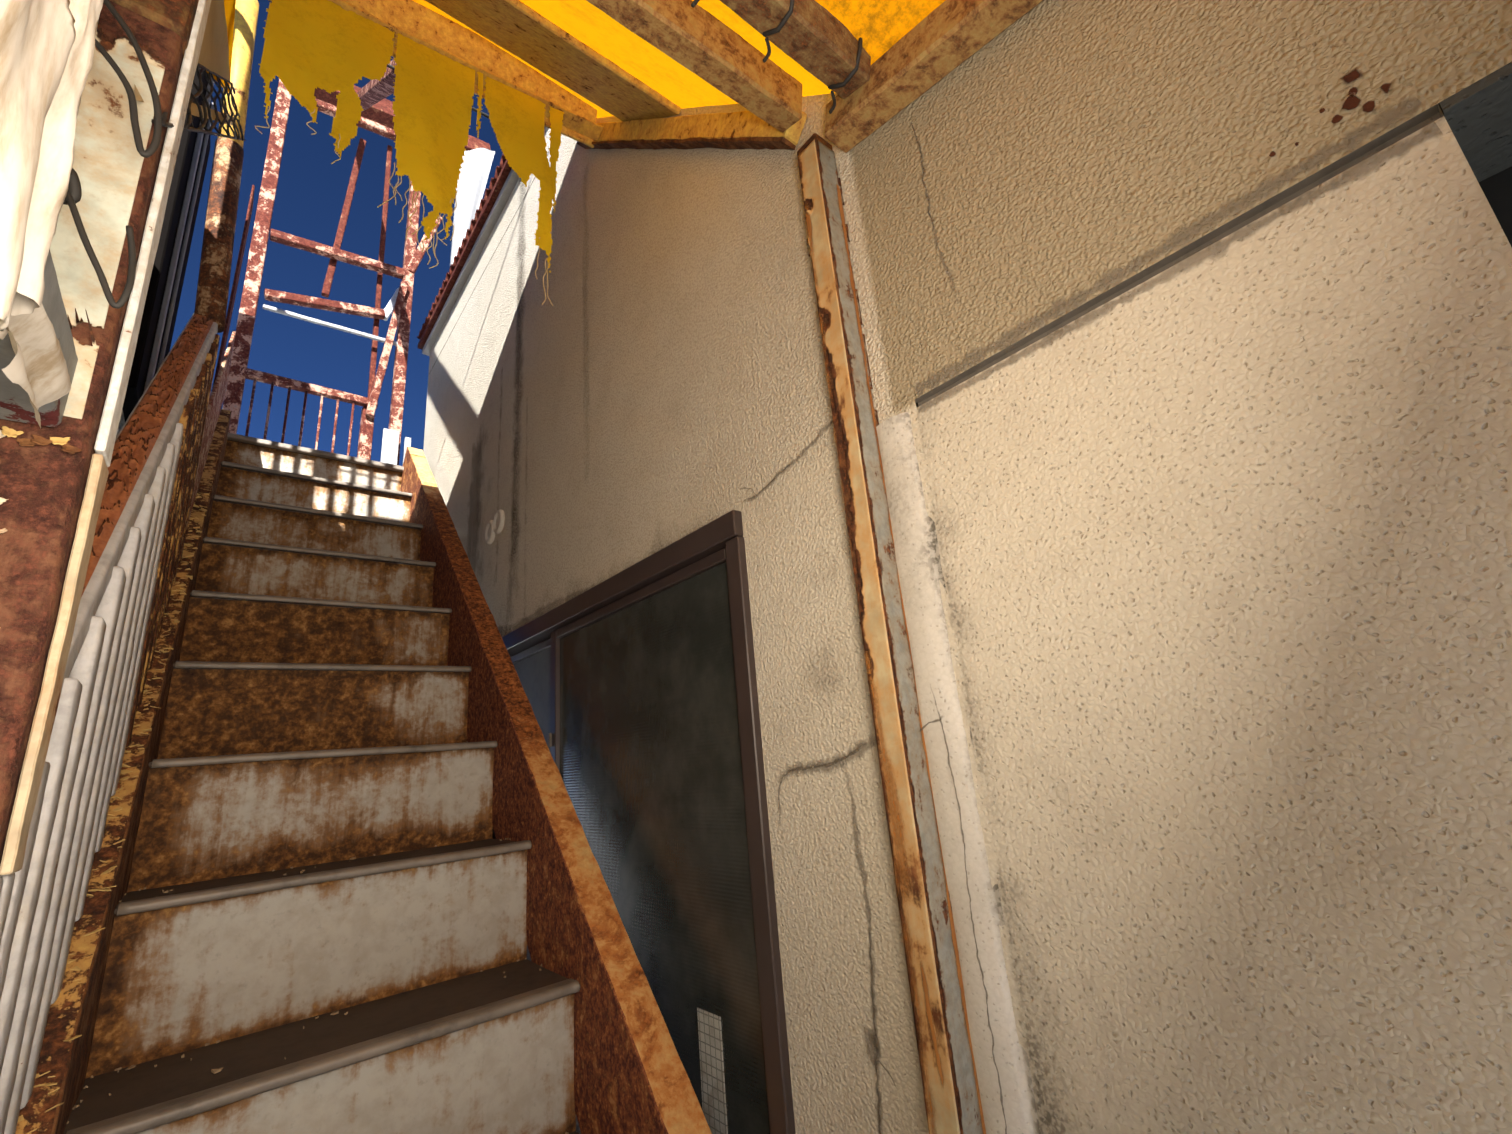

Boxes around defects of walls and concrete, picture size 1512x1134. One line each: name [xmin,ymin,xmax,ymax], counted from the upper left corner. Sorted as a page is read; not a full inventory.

crack [912,126,932,219]
rust [805,204,813,252]
peeling [0,426,82,454]
rust [836,185,986,1134]
crack [787,748,859,774]
crack [870,946,895,1134]